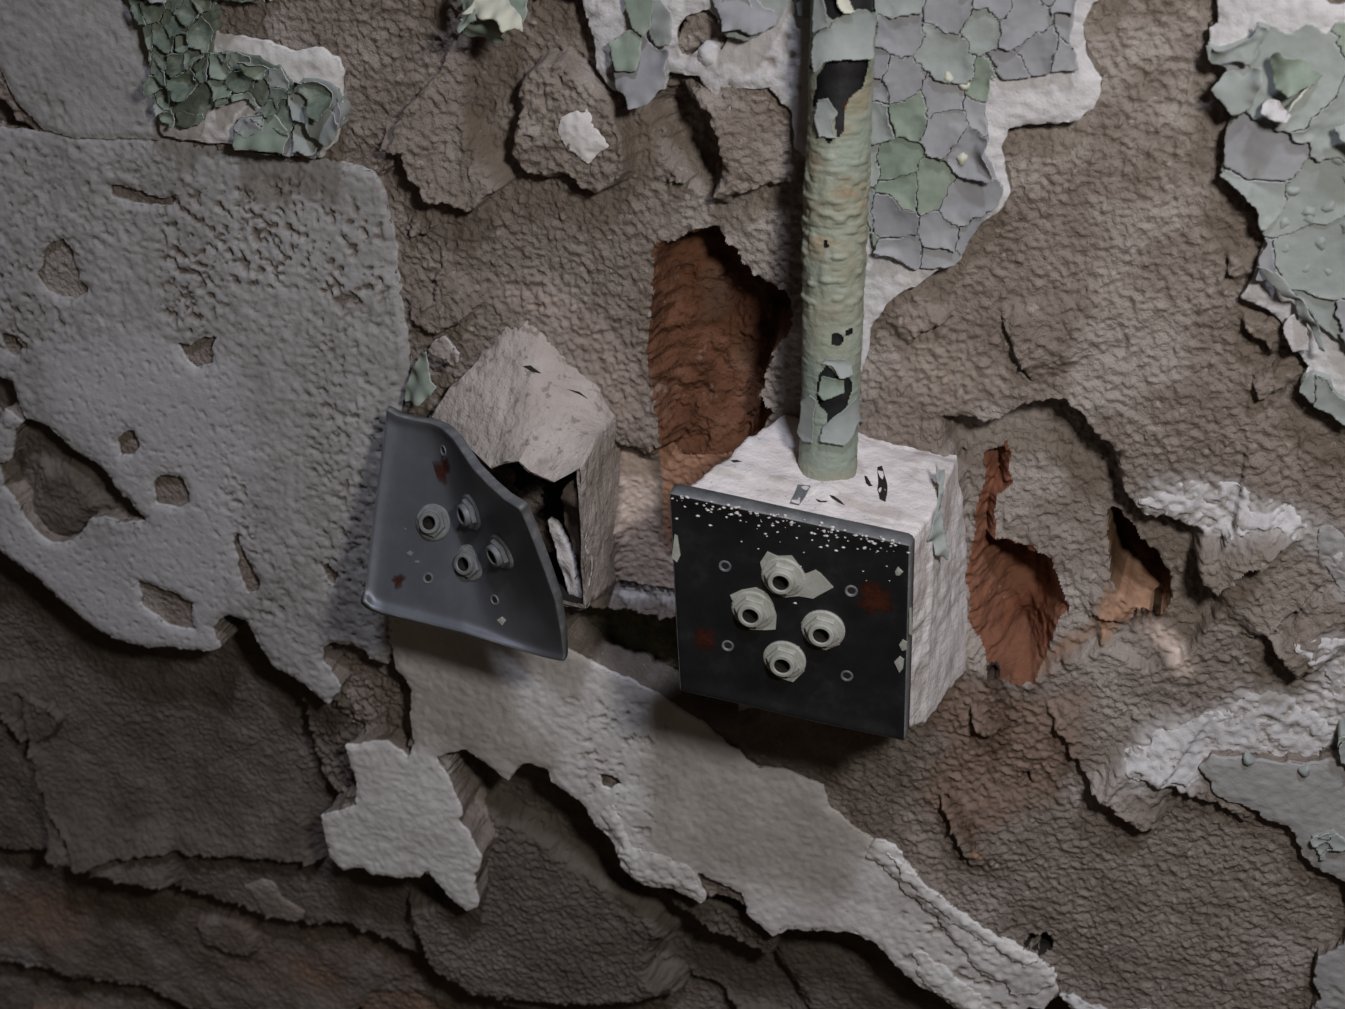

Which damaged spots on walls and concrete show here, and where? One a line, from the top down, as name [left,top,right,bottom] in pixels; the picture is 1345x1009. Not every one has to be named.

peeling [128,0,350,159]
peeling [456,0,528,44]
peeling [608,0,1079,270]
peeling [1206,21,1345,426]
spalling [0,377,18,412]
spalling [646,225,793,554]
spalling [6,419,139,537]
spalling [943,398,1221,686]
spalling [0,551,956,1009]
peeling [1310,829,1345,861]
peeling [1337,718,1345,766]
flaking render [1027,996,1071,1009]